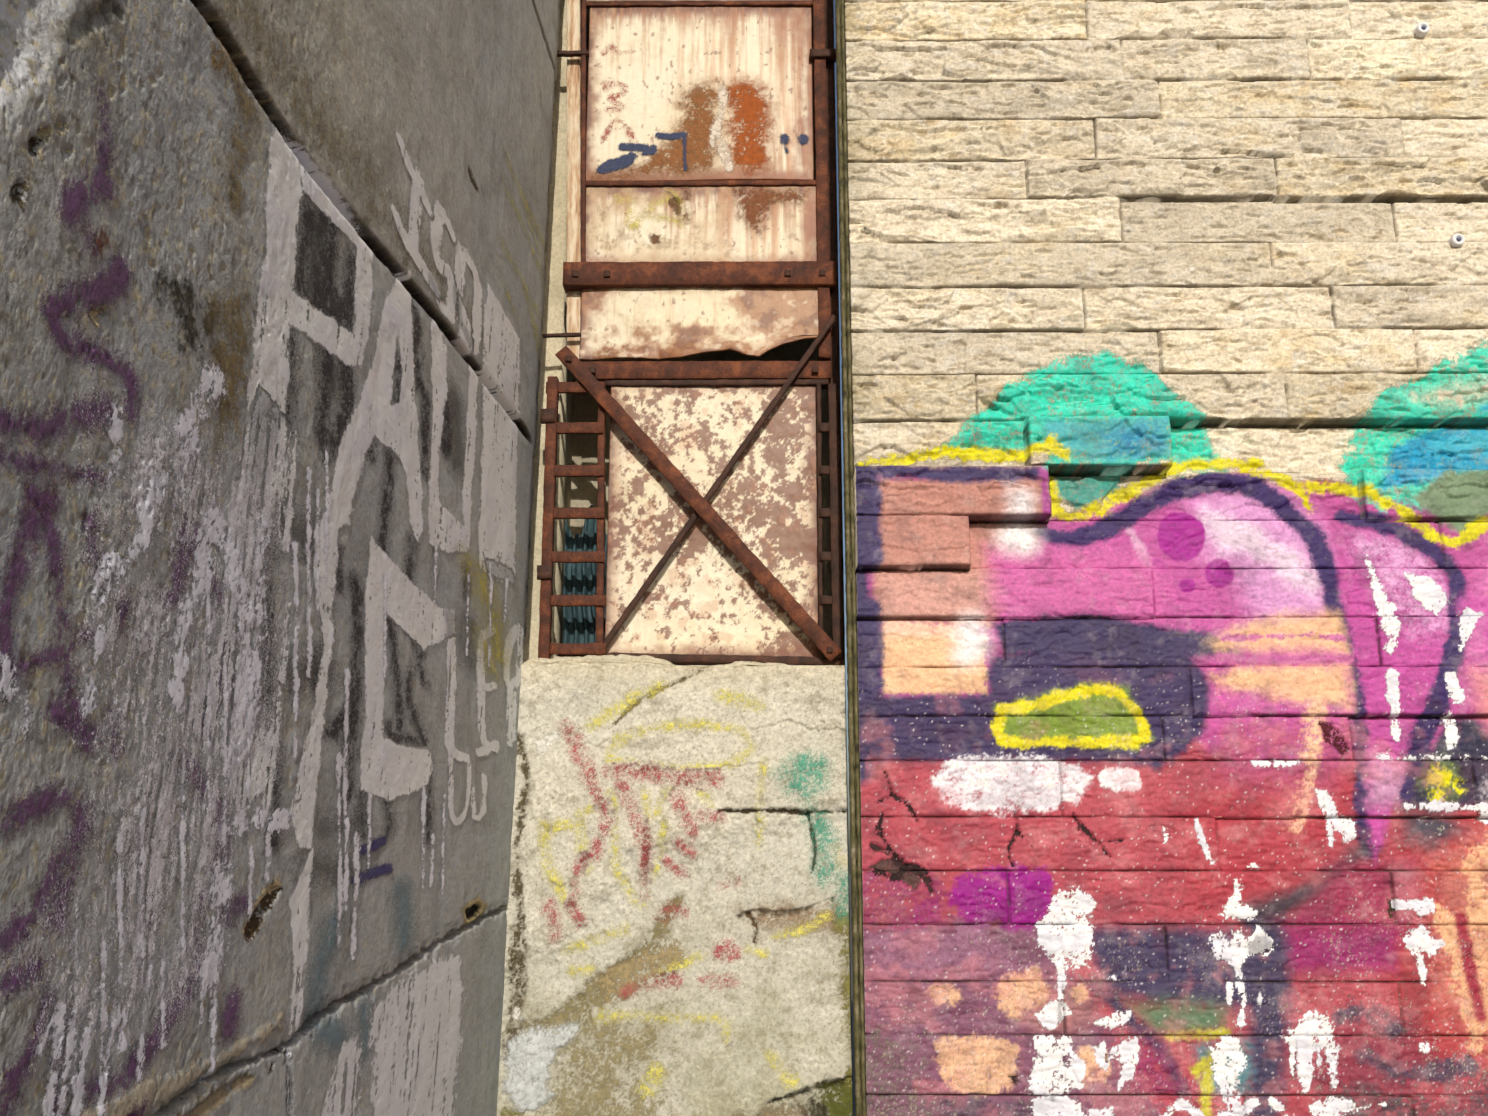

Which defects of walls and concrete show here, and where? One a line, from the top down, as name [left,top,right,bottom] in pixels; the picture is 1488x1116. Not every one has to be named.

corrosion [591,79,807,233]
crack [717,770,936,909]
crack [1006,812,1032,868]
crack [1072,813,1124,857]
crack [735,910,760,945]